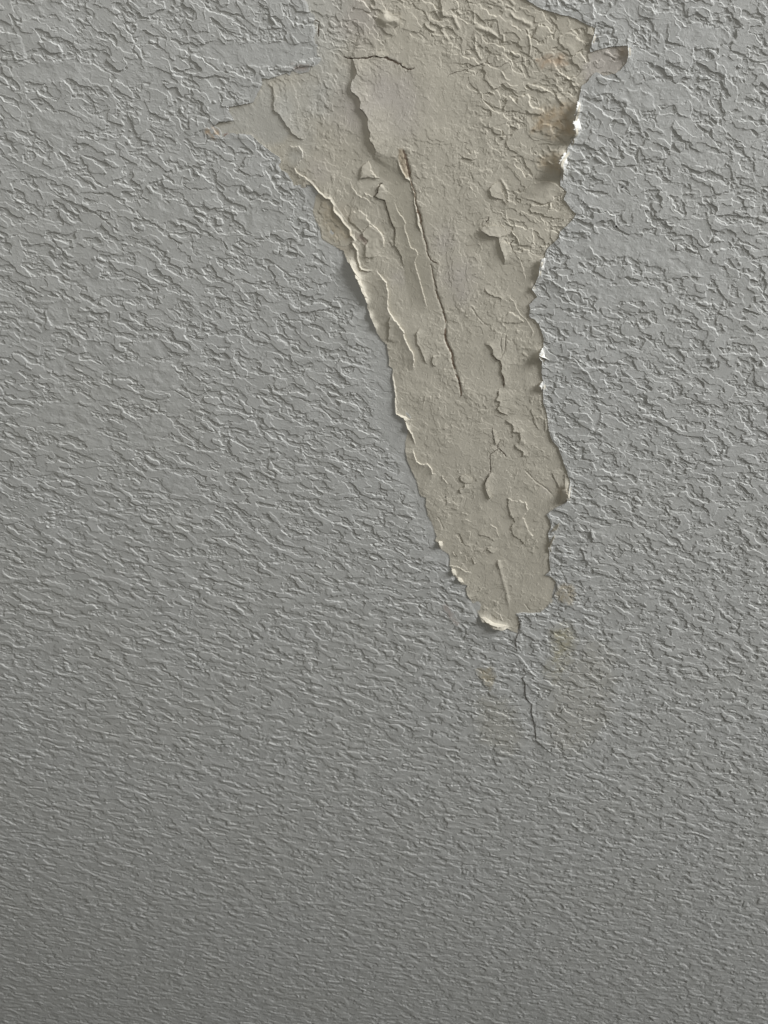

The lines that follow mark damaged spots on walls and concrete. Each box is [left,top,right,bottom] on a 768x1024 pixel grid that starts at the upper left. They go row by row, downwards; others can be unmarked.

peeling [206,0,634,633]